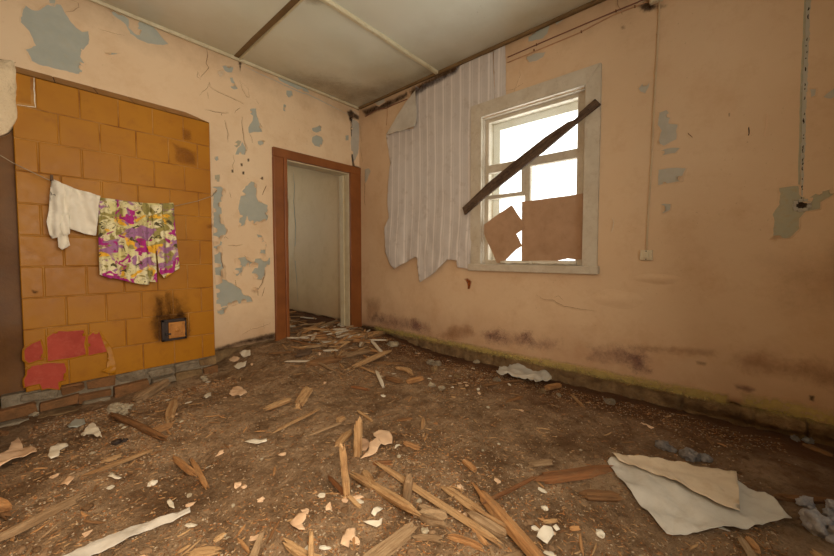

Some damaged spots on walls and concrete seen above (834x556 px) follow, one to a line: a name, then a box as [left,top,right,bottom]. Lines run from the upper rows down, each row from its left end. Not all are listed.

peeling [19,0,91,76]
peeling [107,9,169,46]
peeling [232,108,265,174]
peeling [211,174,271,315]
peeling [769,184,834,243]
peeling [22,329,116,390]